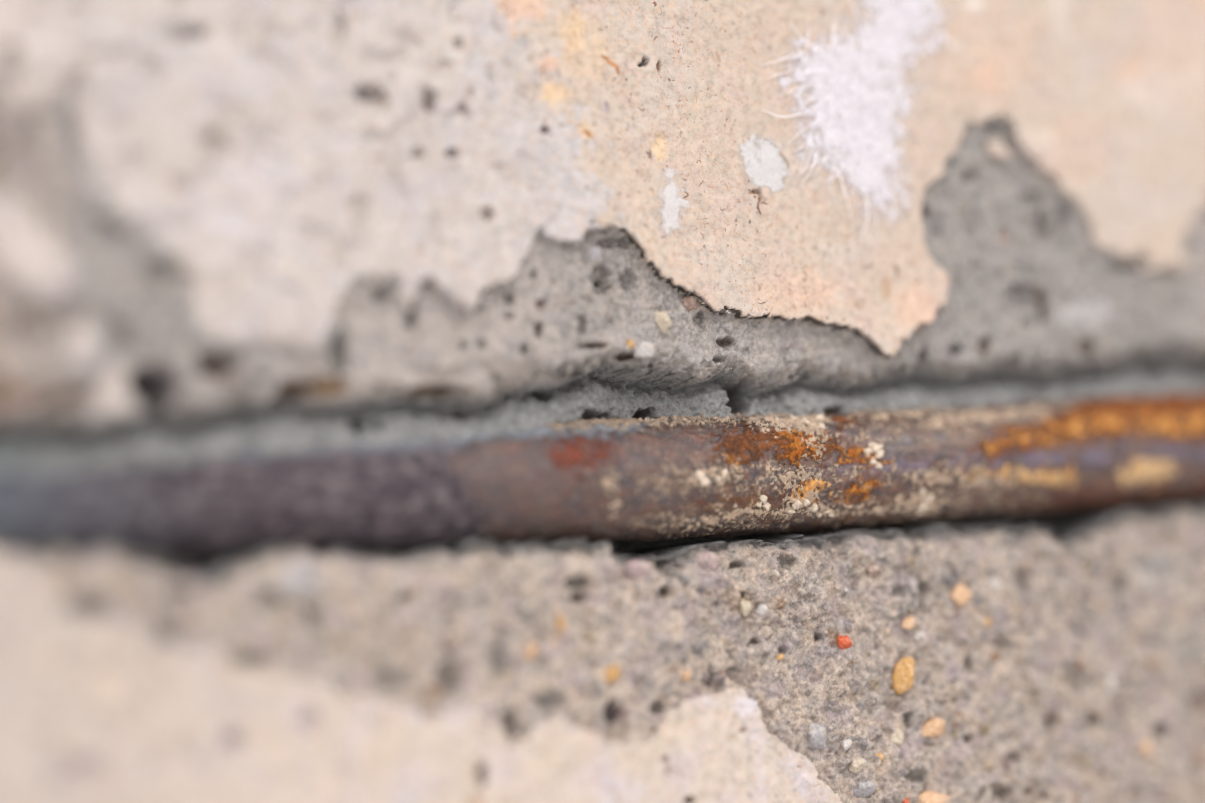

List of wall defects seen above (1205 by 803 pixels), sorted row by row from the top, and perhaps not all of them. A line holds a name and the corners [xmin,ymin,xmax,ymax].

damp [740,0,950,241]
spalling [0,59,1205,427]
rust [686,413,893,525]
rust [926,392,1205,492]